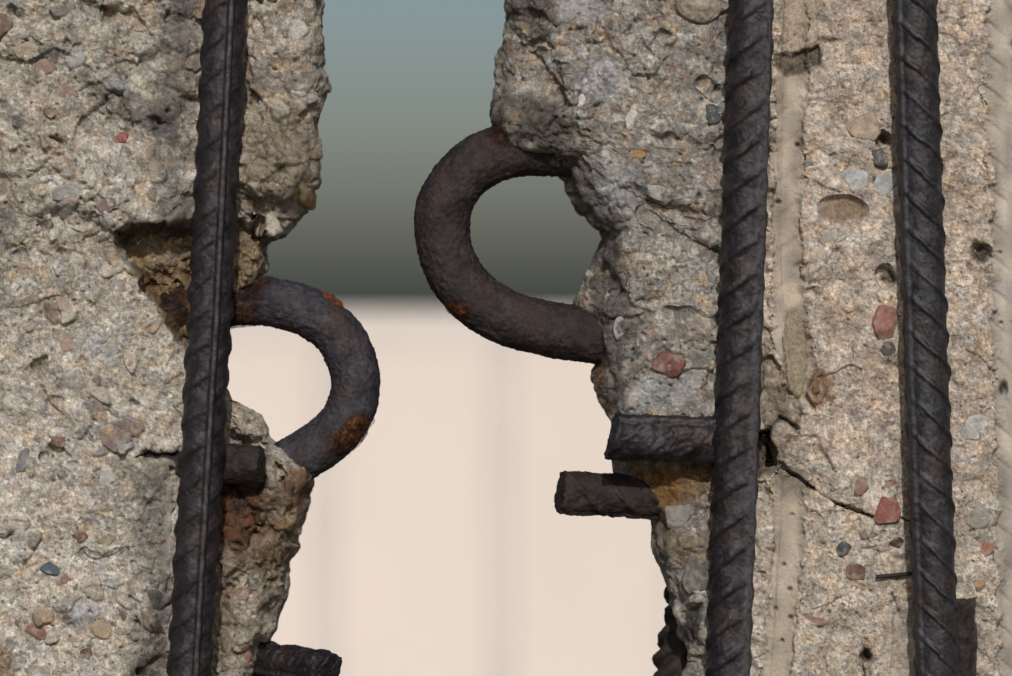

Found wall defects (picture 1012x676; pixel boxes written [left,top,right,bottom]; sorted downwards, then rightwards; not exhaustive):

rust [121,238,191,341]
spalling [118,0,268,676]
rust [230,274,267,329]
rust [445,303,474,319]
spalling [604,0,821,676]
rust [218,471,310,561]
rust [327,416,375,455]
spalling [554,470,660,520]
crack [766,418,870,515]
spalling [251,640,342,676]